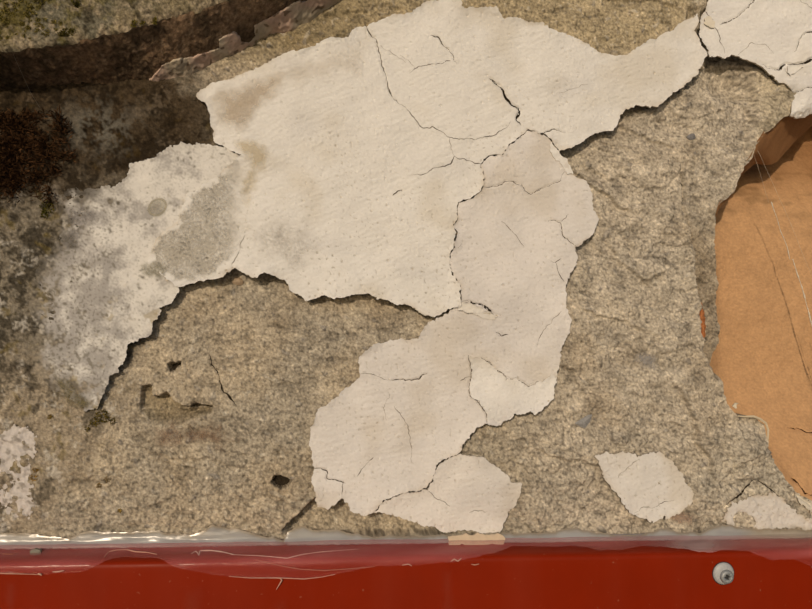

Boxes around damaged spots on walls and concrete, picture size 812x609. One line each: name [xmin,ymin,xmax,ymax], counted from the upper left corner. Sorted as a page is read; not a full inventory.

peeling [0,424,37,519]
crack [209,354,236,405]
peeling [28,0,708,545]
crack [364,23,565,336]
spalling [460,54,812,534]
peeling [462,0,812,119]